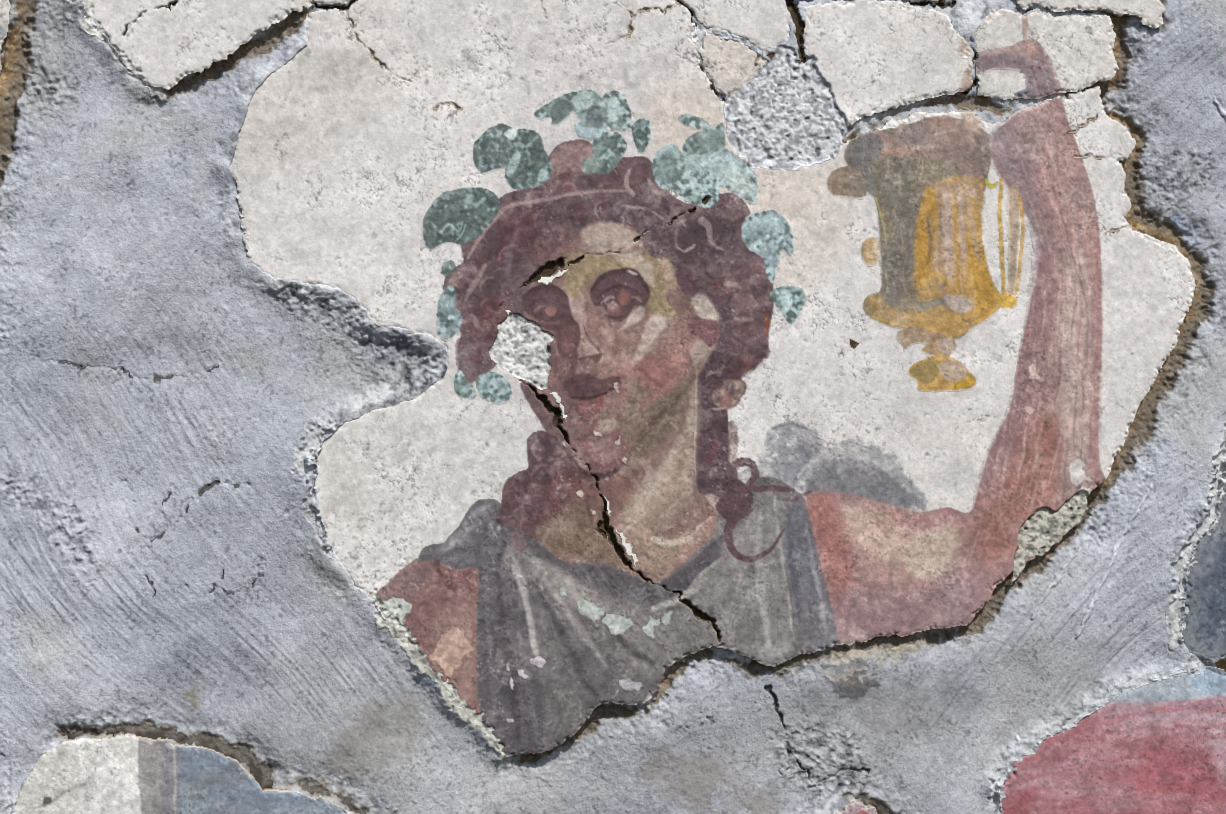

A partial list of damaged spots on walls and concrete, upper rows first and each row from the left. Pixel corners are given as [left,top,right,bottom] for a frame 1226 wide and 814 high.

crack [312,0,387,68]
crack [626,0,726,102]
crack [755,0,809,63]
spalling [724,46,848,170]
spalling [270,282,447,406]
spalling [489,314,554,390]
crack [529,385,569,444]
crack [594,475,722,641]
spalling [1009,459,1092,586]
spalling [368,589,515,763]
crack [764,685,811,777]
spalling [765,717,871,804]